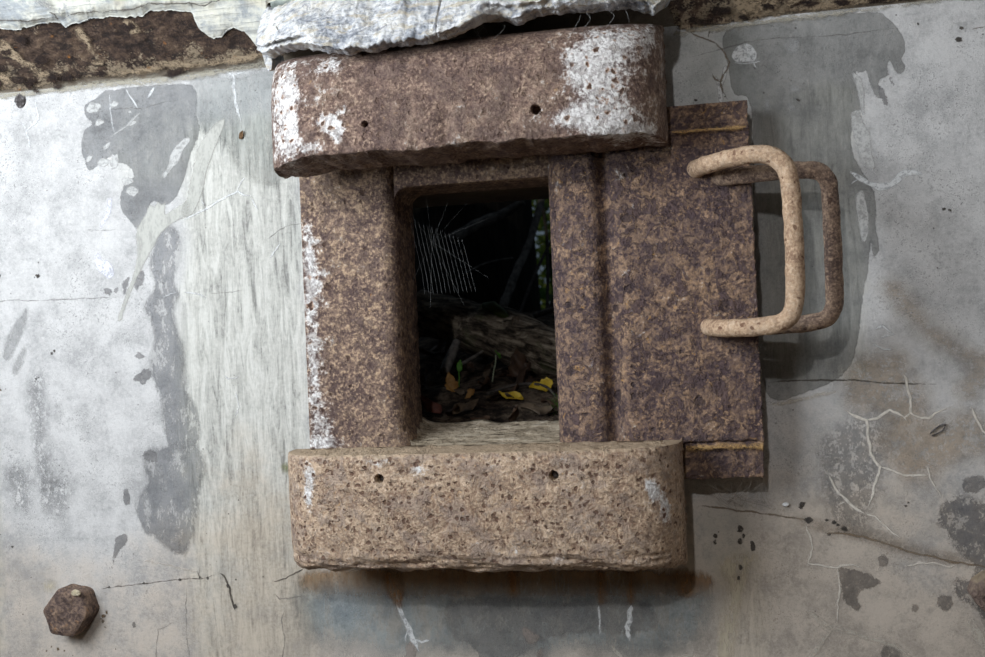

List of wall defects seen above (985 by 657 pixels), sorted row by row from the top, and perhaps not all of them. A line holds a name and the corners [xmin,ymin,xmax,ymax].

spalling [0,0,939,99]
water stain [81,71,280,229]
water stain [723,12,921,400]
water stain [104,227,204,553]
water stain [113,534,127,562]
crack [104,561,237,609]
water stain [306,591,707,657]
crack [707,375,985,621]
water stain [937,475,985,648]